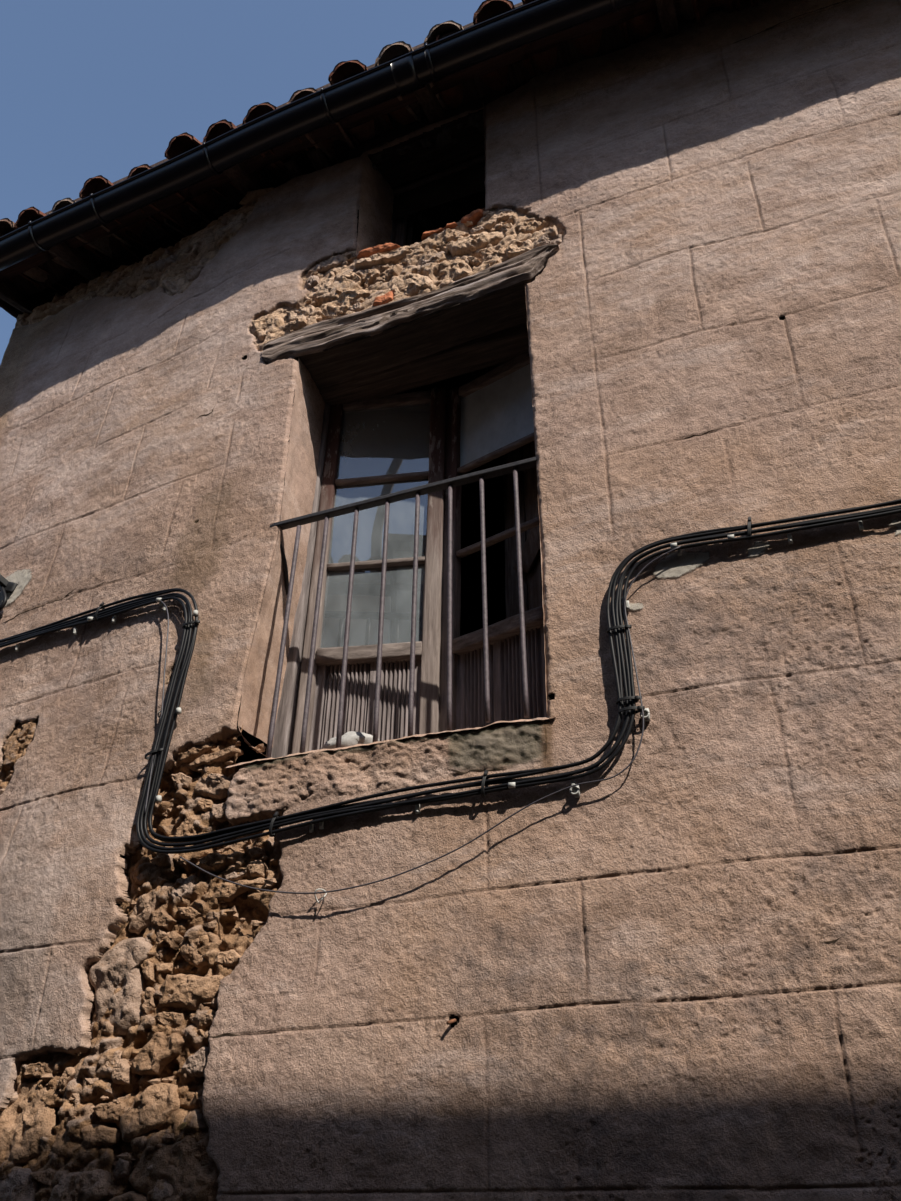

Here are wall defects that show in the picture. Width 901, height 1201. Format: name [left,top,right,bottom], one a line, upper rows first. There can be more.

spalling [15,202,257,328]
spalling [249,206,566,352]
spalling [0,719,283,1201]